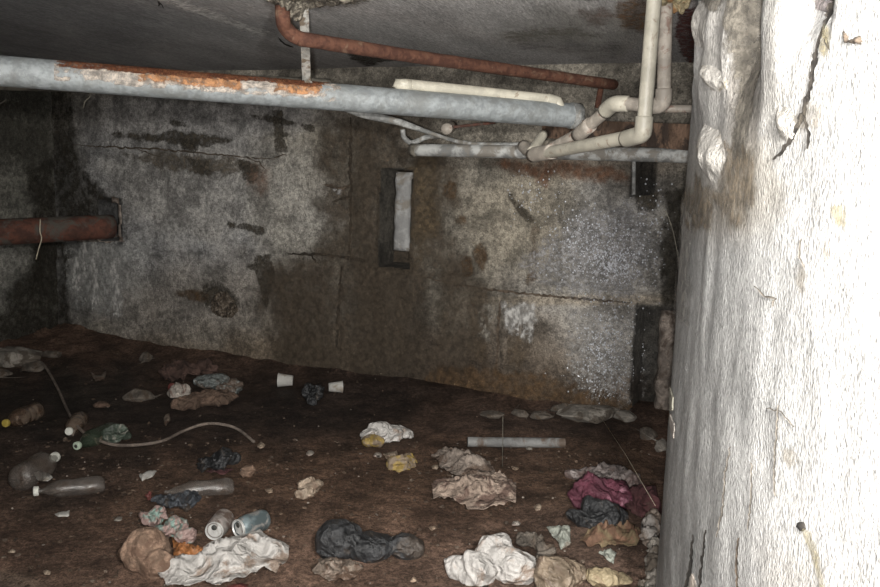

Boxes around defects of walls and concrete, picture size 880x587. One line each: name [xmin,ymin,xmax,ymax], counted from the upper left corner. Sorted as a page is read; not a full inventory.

corrosion [57,60,329,95]
crack [773,0,834,160]
damp [112,120,260,183]
damp [34,241,124,325]
damp [503,303,536,363]